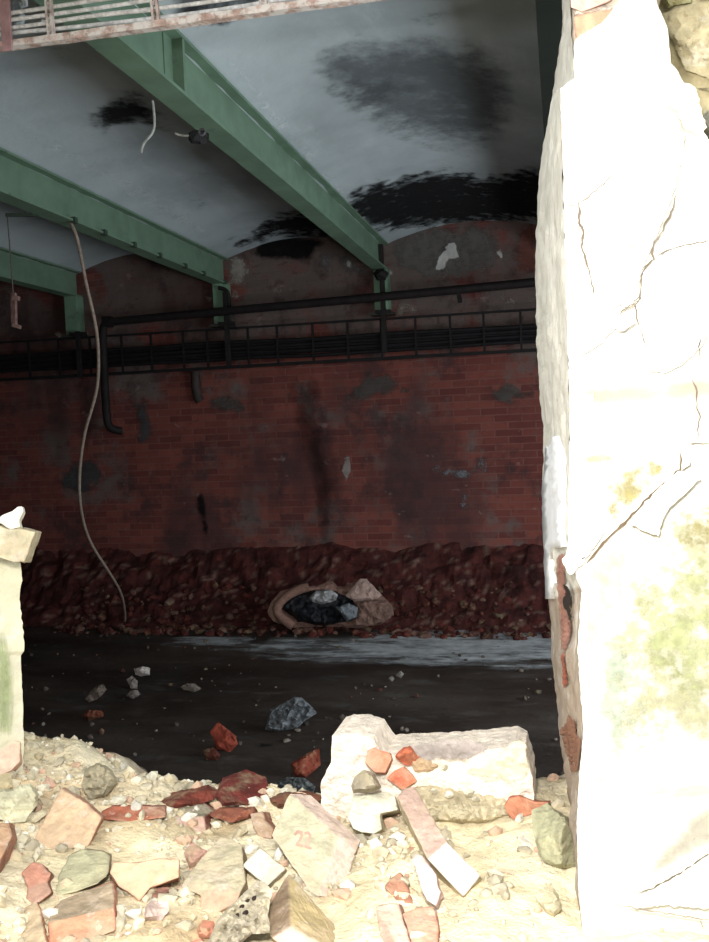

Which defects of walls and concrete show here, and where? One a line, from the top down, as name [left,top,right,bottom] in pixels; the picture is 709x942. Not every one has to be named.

water stain [332,53,503,132]
flaking render [564,79,709,376]
crack [564,173,709,366]
crack [587,378,709,563]
crack [614,854,709,927]